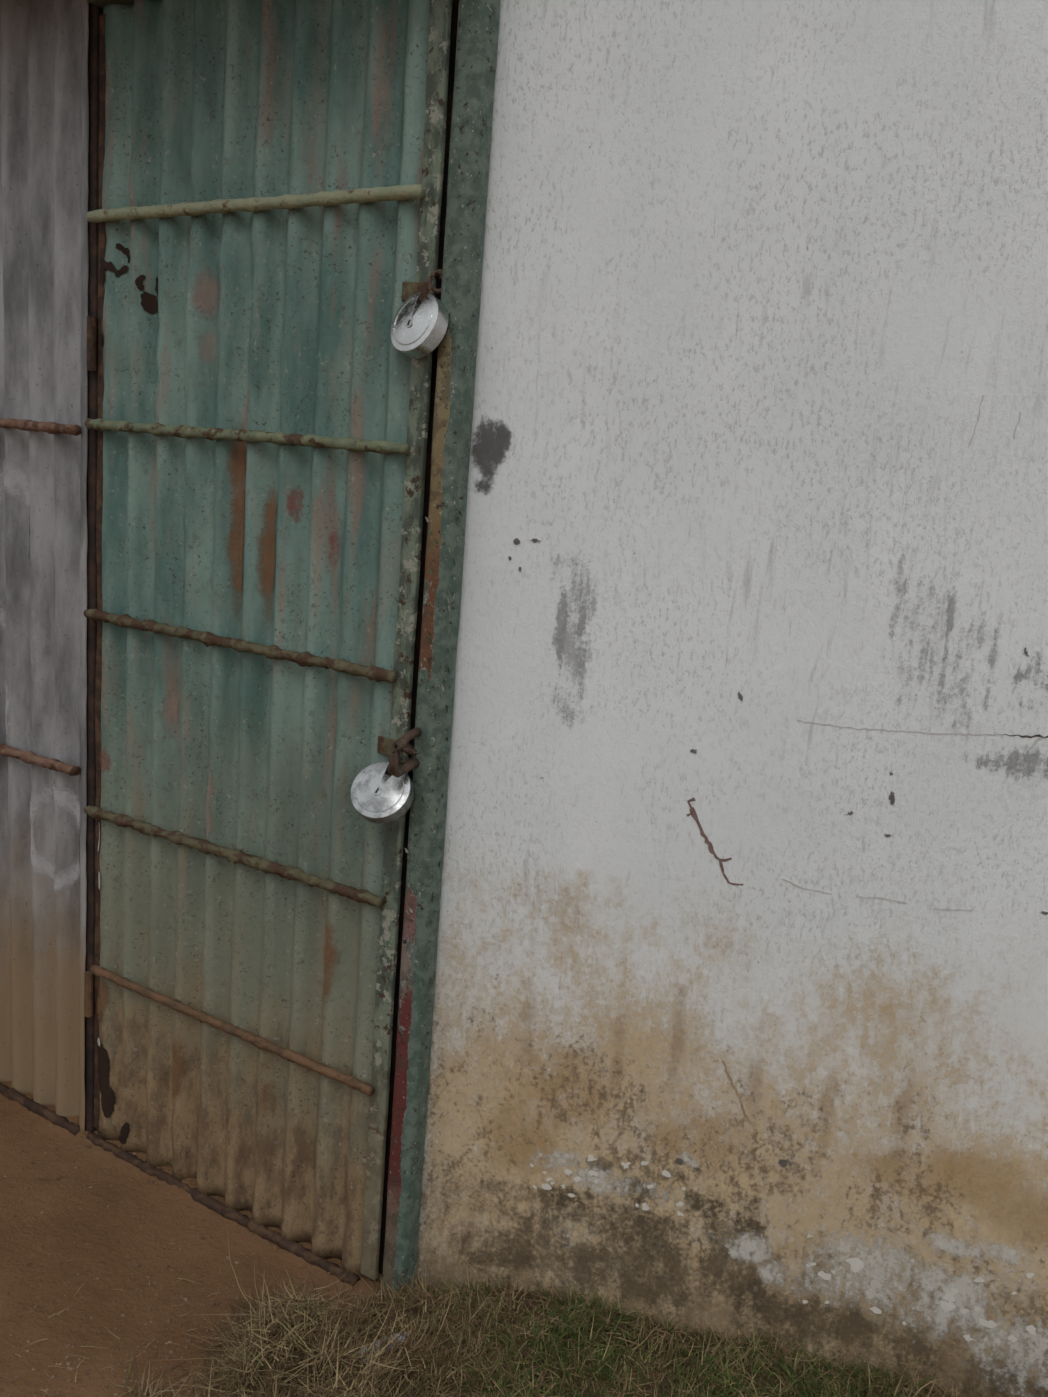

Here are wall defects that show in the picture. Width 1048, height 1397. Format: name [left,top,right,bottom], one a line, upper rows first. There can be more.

rust [229,441,276,595]
damp [472,420,511,494]
damp [889,555,998,727]
crack [797,720,1048,751]
damp [461,1159,874,1348]